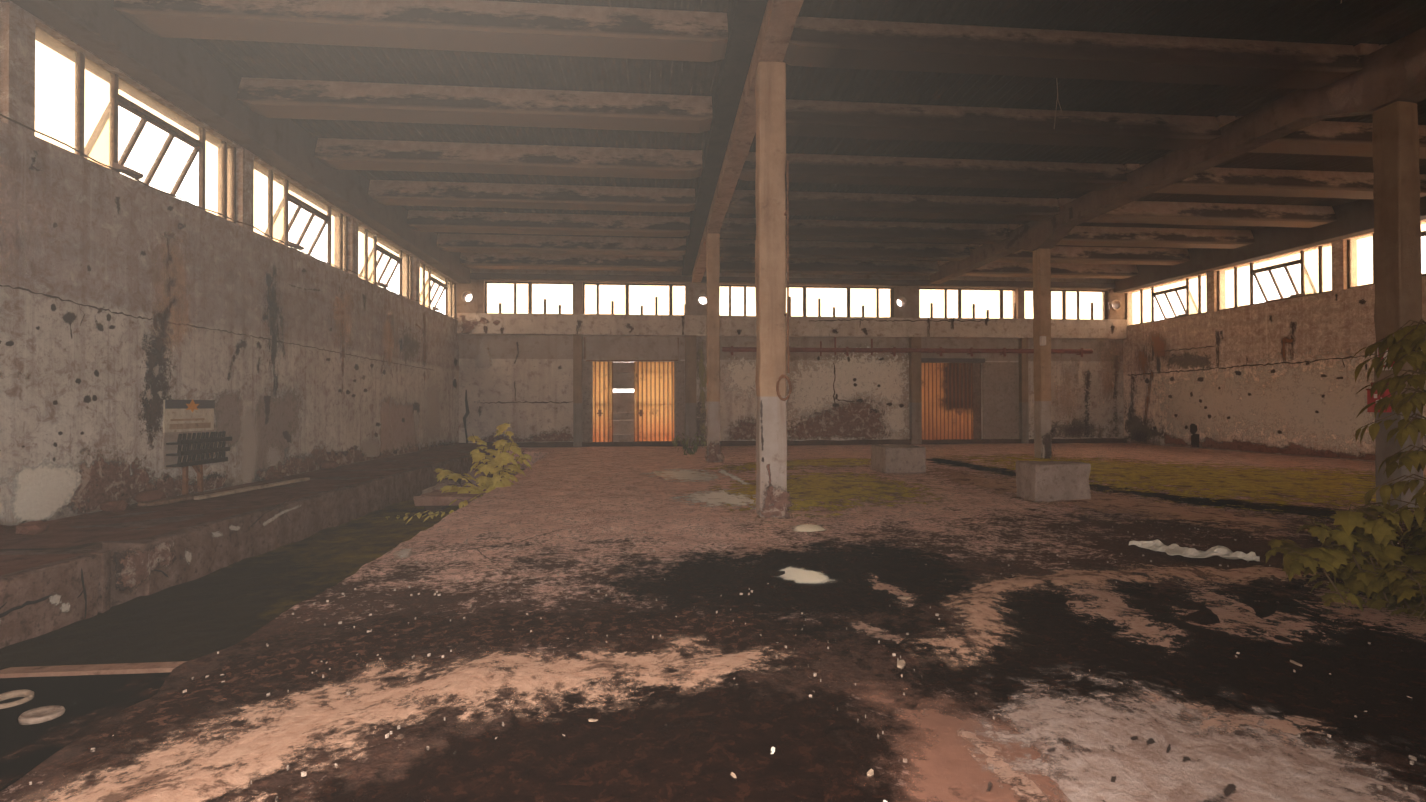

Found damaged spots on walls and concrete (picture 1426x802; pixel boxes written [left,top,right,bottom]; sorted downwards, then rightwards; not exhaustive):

water stain [138,314,176,449]
crack [0,285,434,371]
water stain [228,273,286,425]
crack [463,382,569,443]